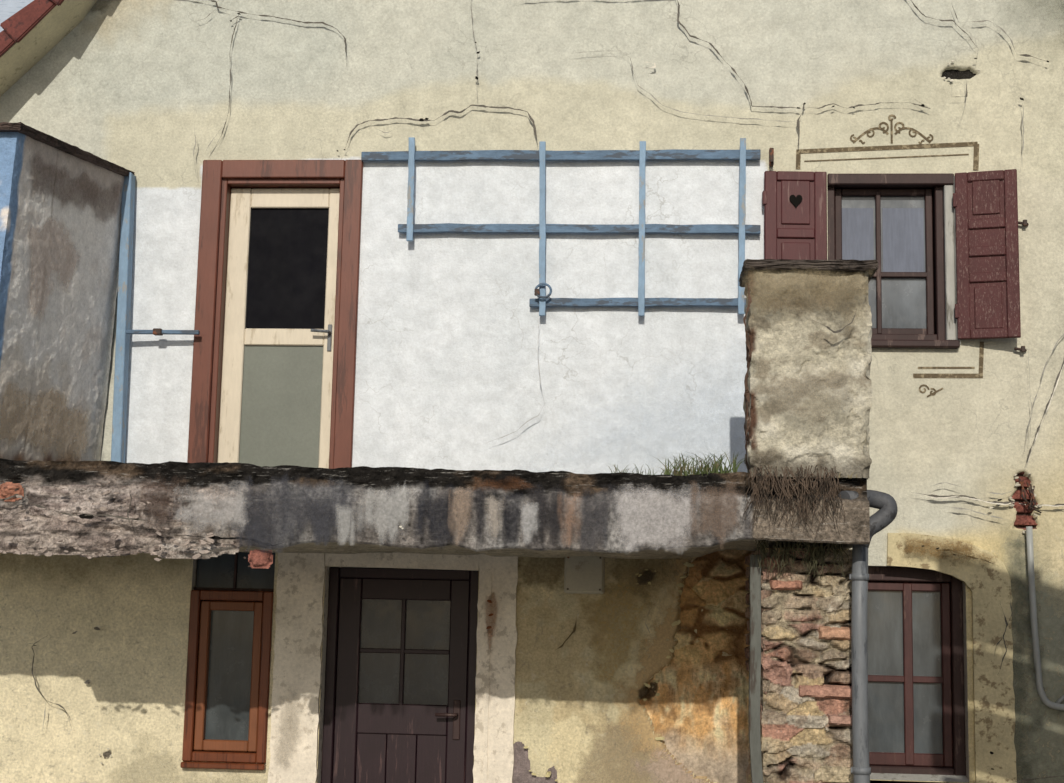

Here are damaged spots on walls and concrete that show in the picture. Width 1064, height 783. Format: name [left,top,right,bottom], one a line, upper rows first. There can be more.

crack [193,0,347,172]
crack [337,7,538,151]
crack [571,0,930,145]
spalling [941,60,980,82]
crack [912,2,1049,62]
crack [743,285,752,442]
crack [1024,334,1064,468]
leakage [140,480,458,548]
leakage [476,487,562,541]
crack [911,482,1064,520]
spalling [635,549,755,783]
peeling [512,741,558,783]